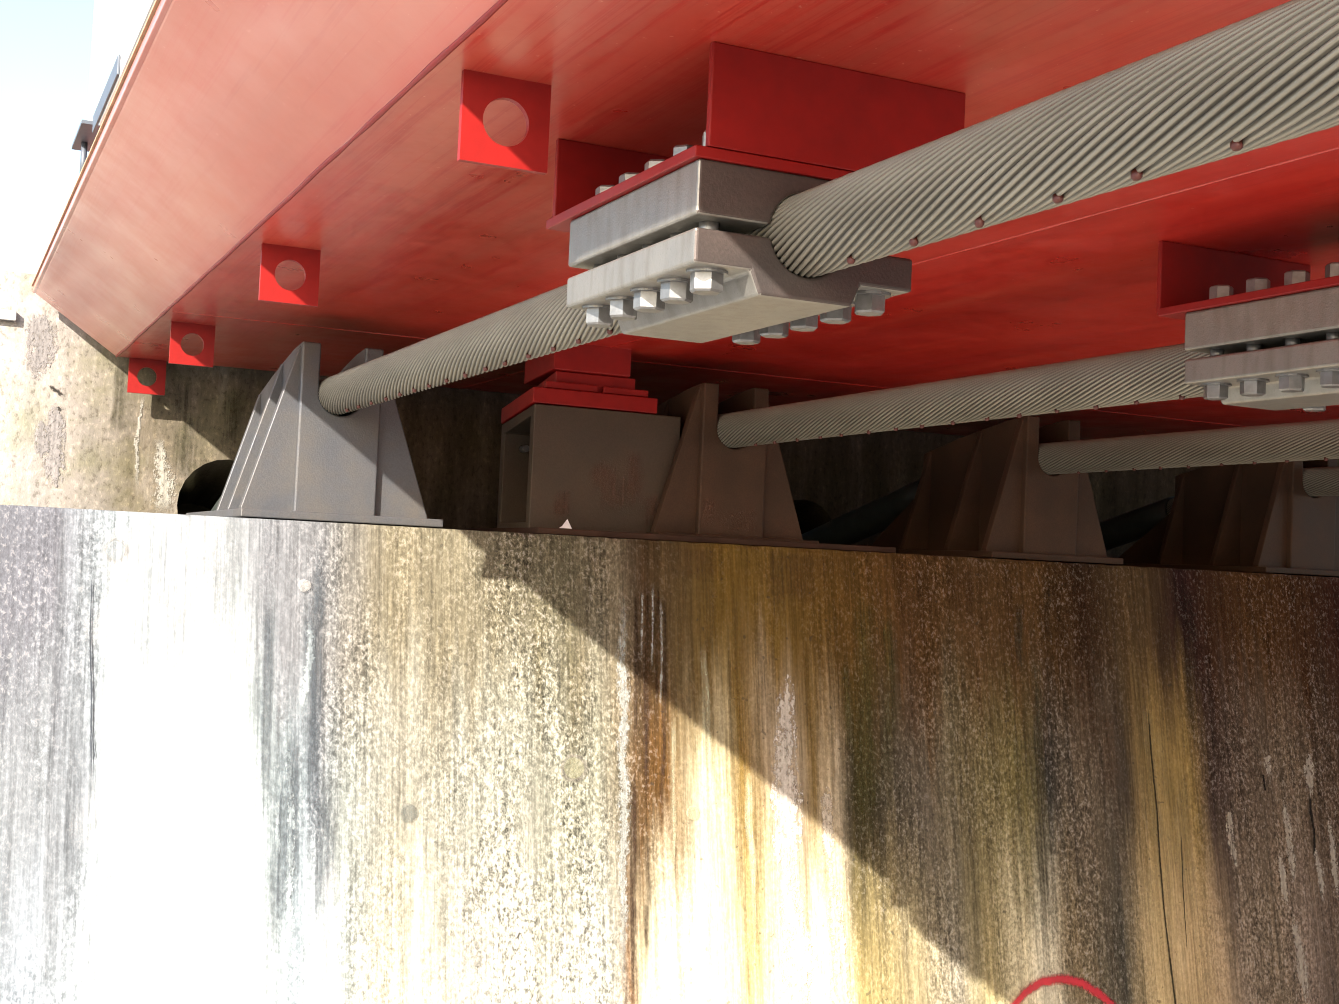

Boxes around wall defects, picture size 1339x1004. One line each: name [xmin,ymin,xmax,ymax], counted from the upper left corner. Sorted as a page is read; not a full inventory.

leakage [260,574,321,923]
leakage [745,785,755,886]
leakage [1034,733,1048,907]
crack [1148,717,1187,1004]